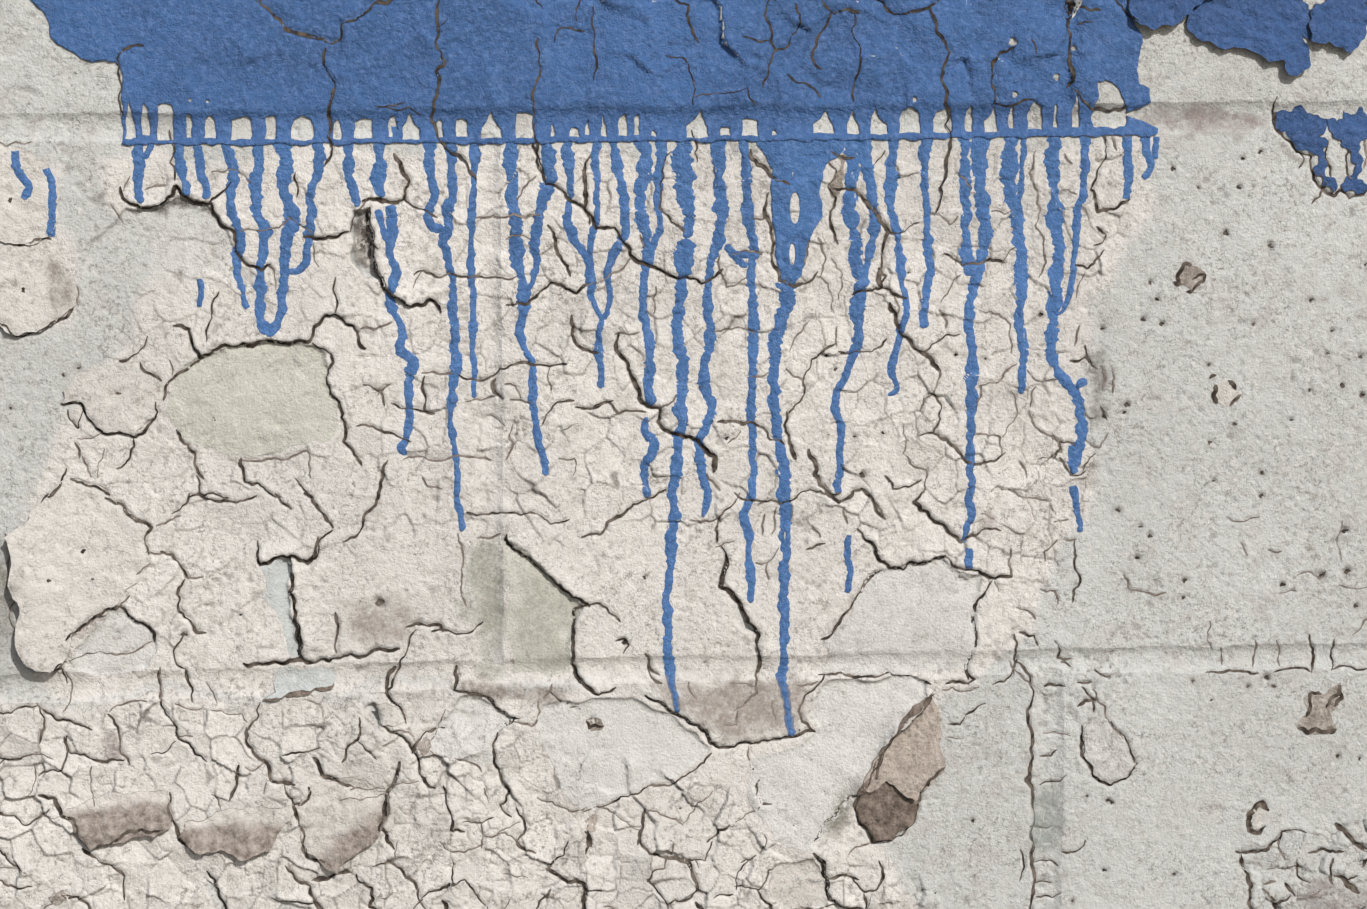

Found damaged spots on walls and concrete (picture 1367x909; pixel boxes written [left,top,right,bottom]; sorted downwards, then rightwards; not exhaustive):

peeling [1128,0,1367,76]
peeling [1272,105,1367,194]
peeling [62,341,338,456]
crack [0,37,1138,909]
peeling [4,477,158,675]
peeling [747,556,980,909]
spalling [1298,684,1344,735]
peeling [61,790,172,850]
peeling [297,777,390,875]
crack [1235,800,1367,909]